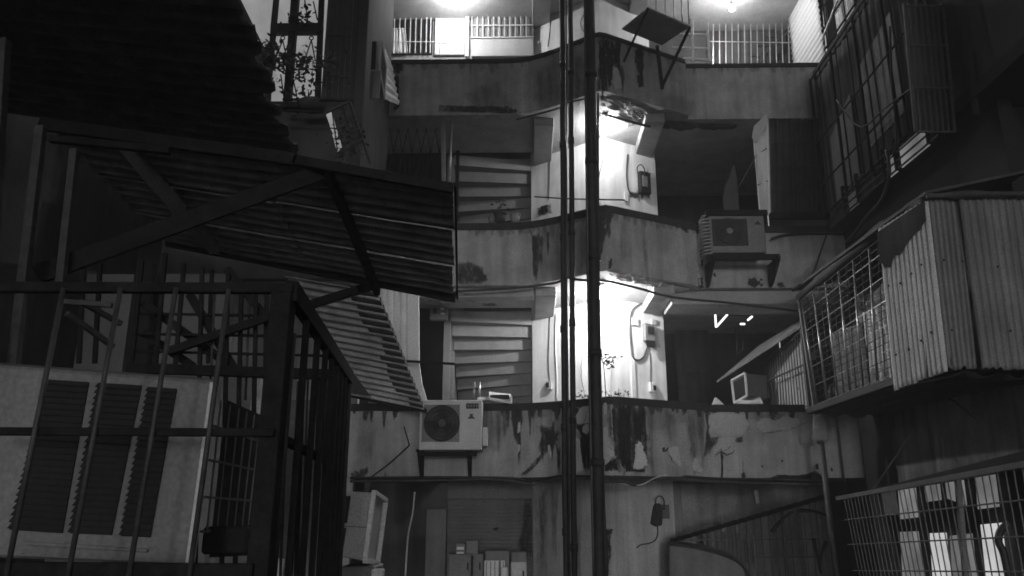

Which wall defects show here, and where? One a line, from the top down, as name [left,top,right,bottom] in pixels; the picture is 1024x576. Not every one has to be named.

water stain [597,37,644,99]
water stain [500,408,561,475]
water stain [576,407,590,470]
peeling [633,441,648,470]
water stain [605,404,717,475]